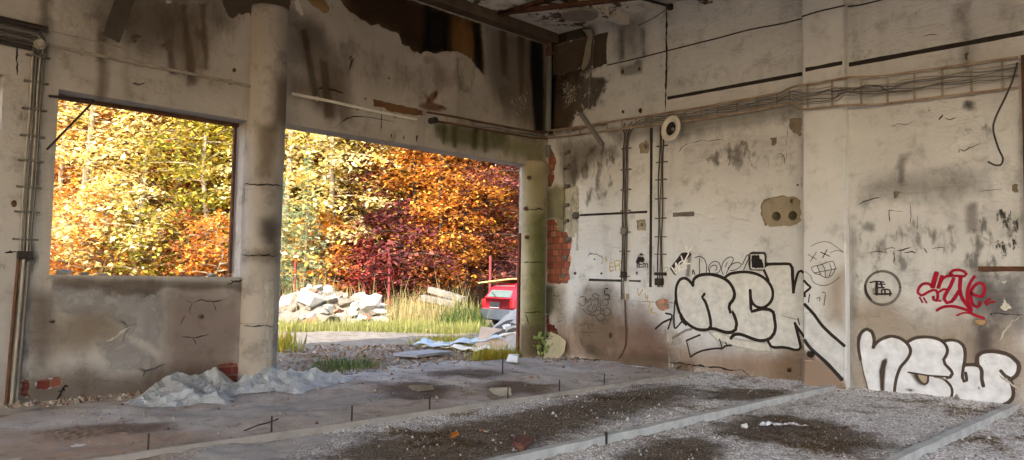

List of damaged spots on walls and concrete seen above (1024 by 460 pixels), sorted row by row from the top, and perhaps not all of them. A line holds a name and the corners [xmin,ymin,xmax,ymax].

spalling [341,0,485,75]
peeling [555,29,609,122]
flaking render [546,185,579,284]
spalling [759,195,802,227]
crack [180,254,274,344]
flaking render [20,376,62,399]
flaking render [214,363,238,382]